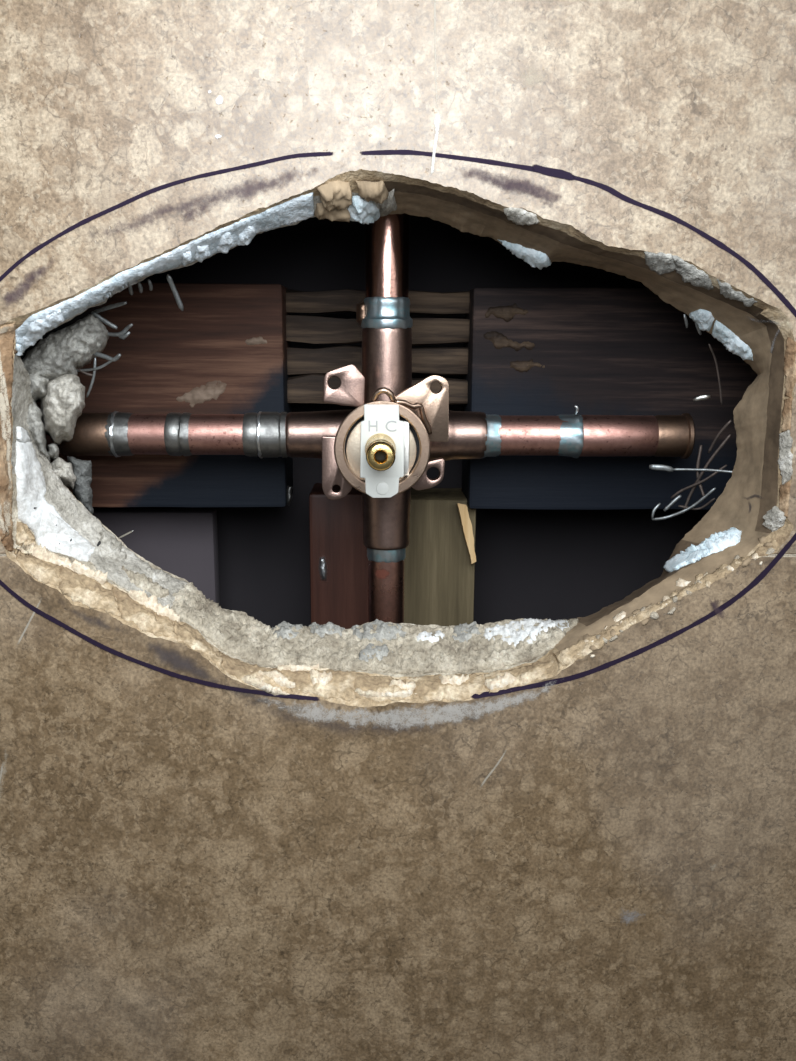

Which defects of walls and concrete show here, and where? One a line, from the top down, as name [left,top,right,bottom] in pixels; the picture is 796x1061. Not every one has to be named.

spalling [0,180,796,702]